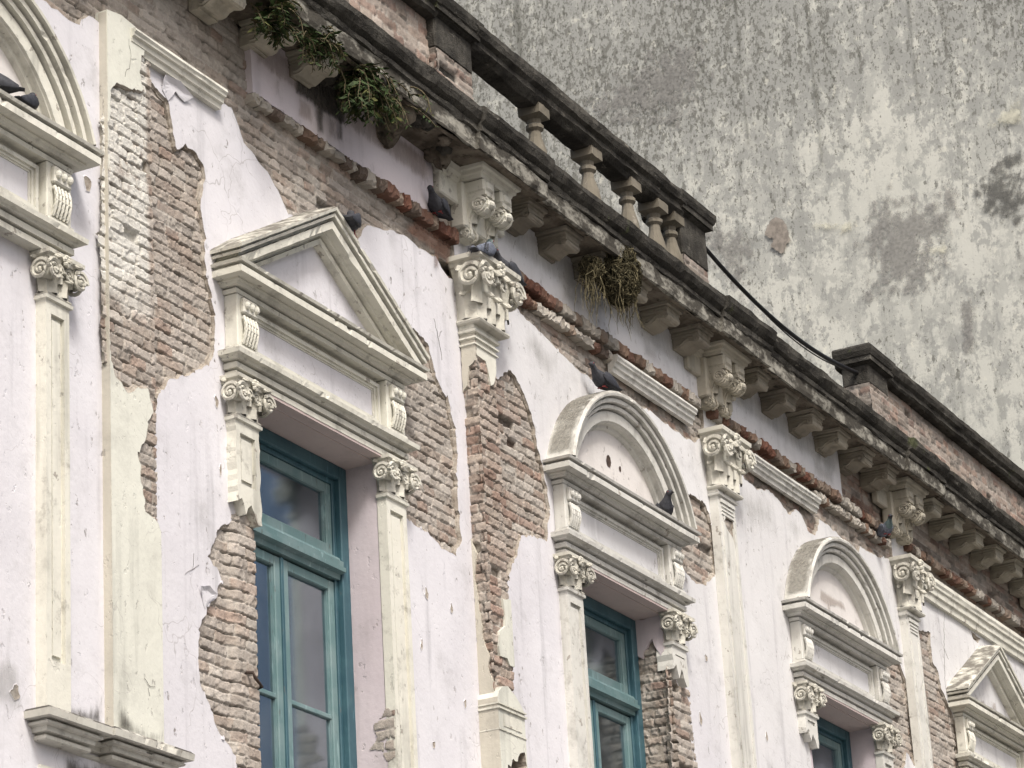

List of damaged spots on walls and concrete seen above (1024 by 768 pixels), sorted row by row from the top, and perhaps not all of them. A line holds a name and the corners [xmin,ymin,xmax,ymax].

spalling [83,56,216,533]
spalling [44,0,454,279]